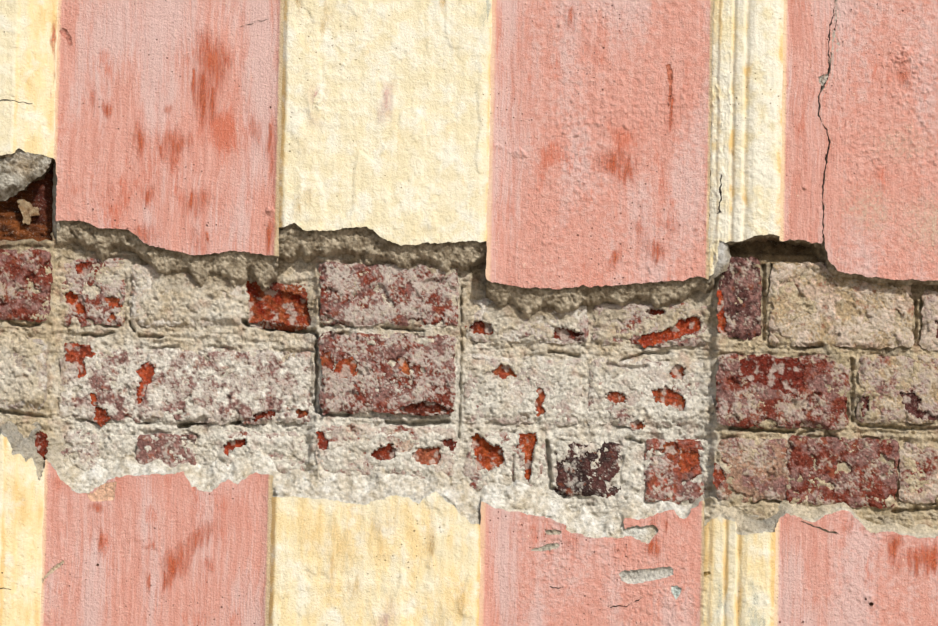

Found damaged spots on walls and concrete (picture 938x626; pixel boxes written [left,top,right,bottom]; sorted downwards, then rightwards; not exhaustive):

crack [818,0,840,246]
spalling [0,148,938,551]